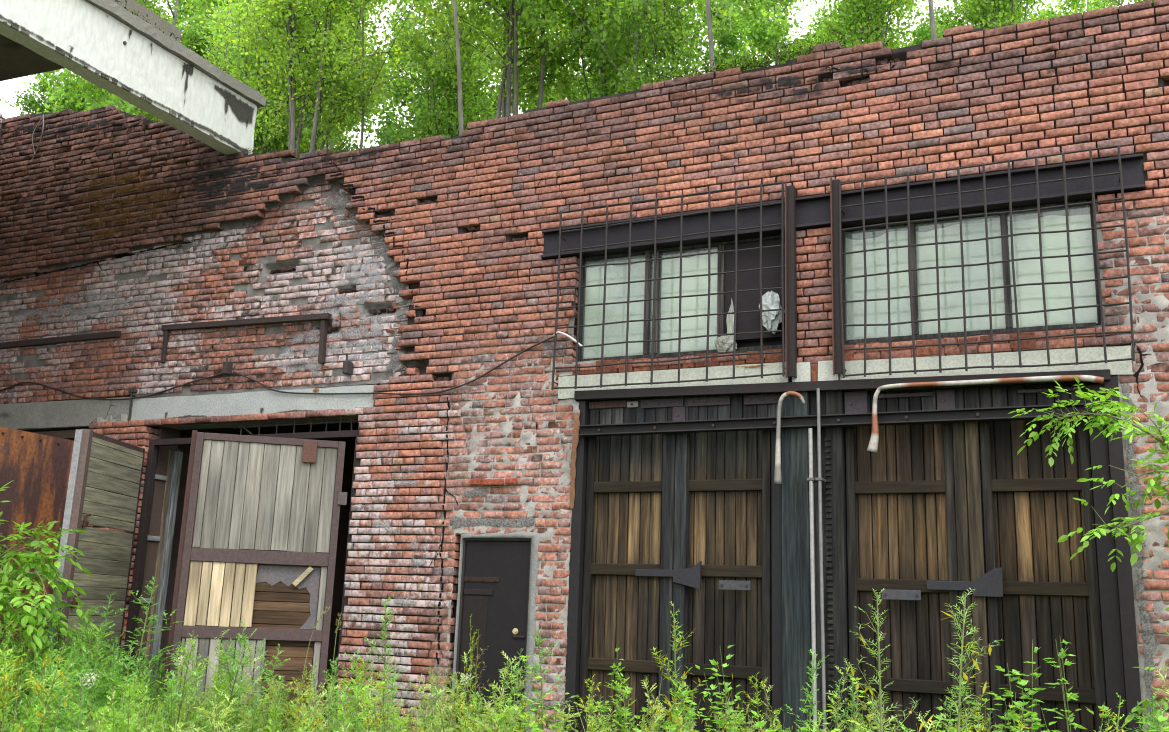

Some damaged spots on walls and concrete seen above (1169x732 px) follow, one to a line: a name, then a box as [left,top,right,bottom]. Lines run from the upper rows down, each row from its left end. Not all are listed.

damp [0,14,282,215]
spalling [270,266,296,274]
spalling [326,189,412,377]